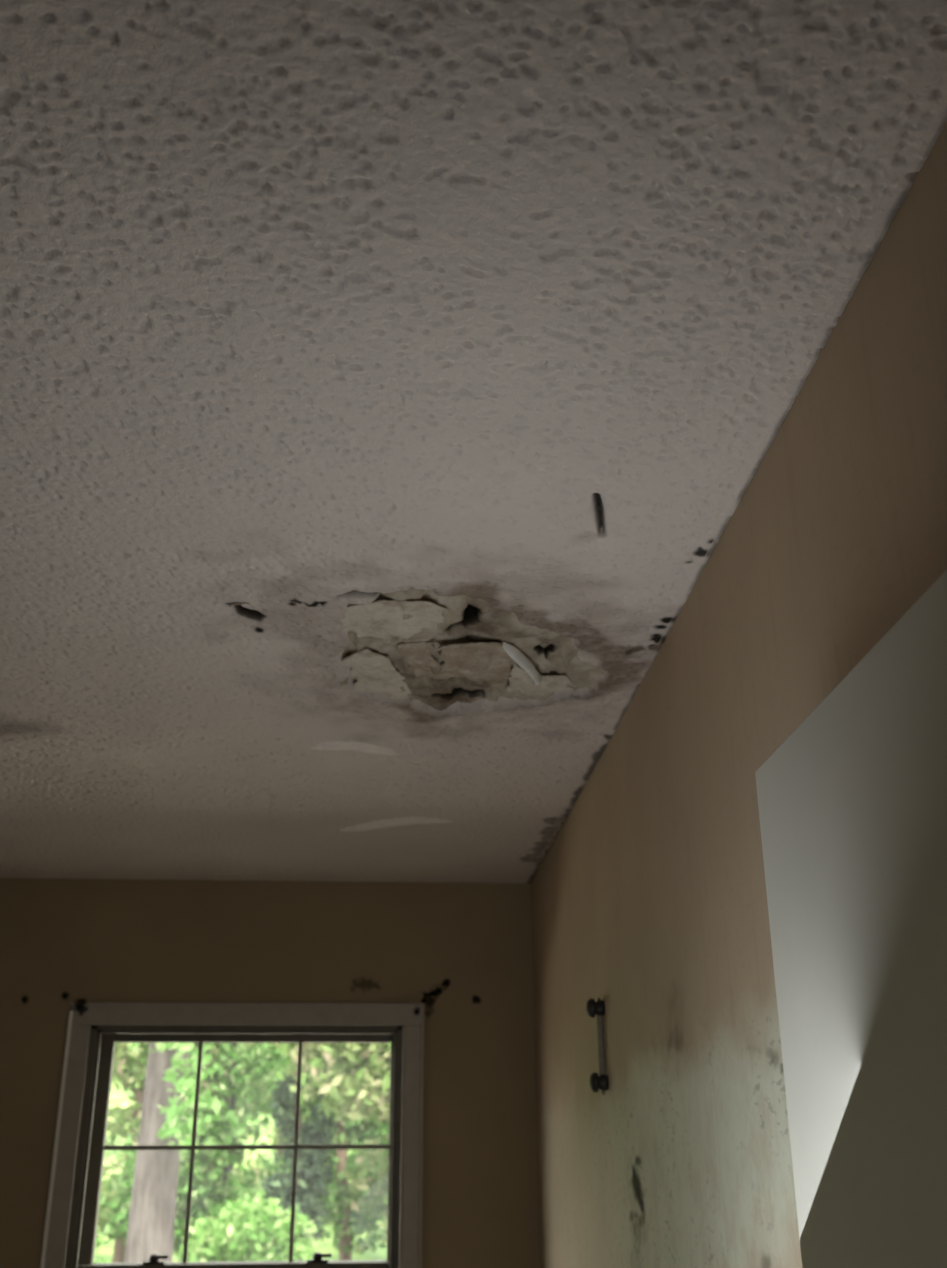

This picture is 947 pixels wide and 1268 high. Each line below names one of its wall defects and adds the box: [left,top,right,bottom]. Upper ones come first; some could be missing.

peeling [227,602,265,632]